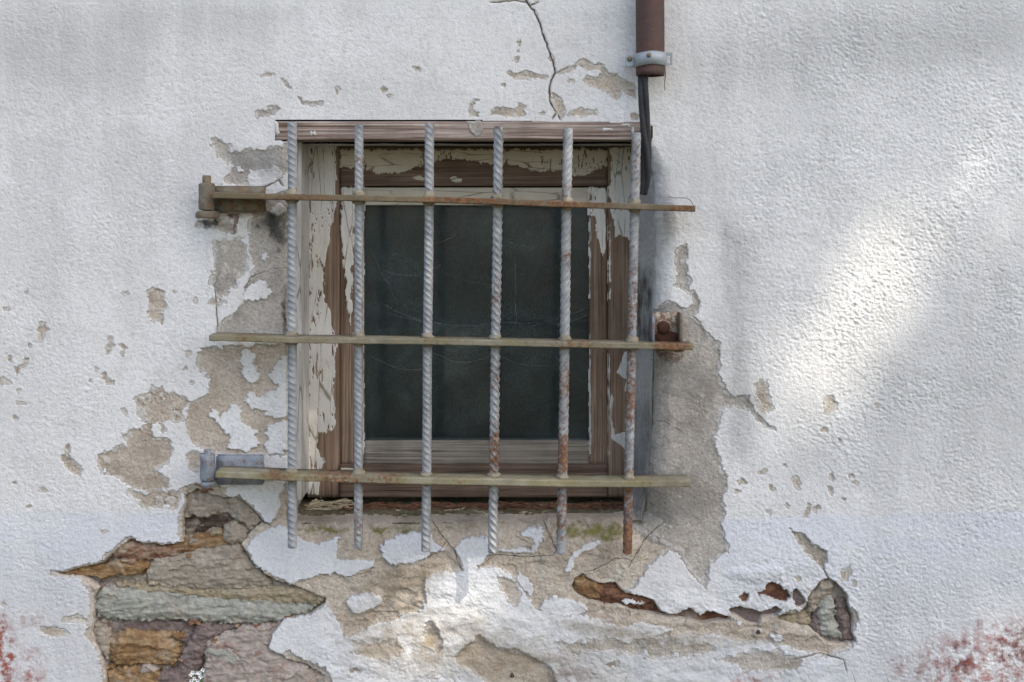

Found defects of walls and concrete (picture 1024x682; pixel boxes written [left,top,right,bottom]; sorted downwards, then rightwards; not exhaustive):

crack [490,0,568,119]
peeling [501,41,636,100]
peeling [468,99,526,118]
peeling [540,93,597,119]
flaking render [40,138,858,682]
crack [427,519,557,568]
crack [589,522,665,571]